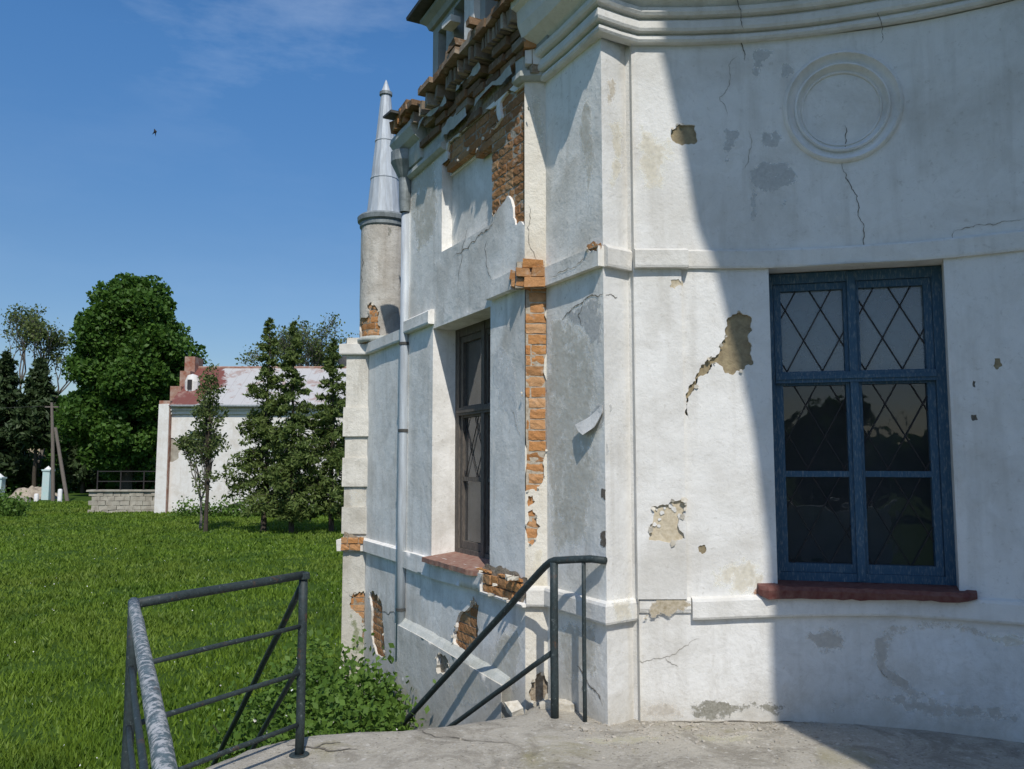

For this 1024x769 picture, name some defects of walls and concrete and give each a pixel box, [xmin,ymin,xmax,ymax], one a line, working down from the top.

crack [719,0,746,116]
spalling [389,0,530,223]
peeling [640,123,697,187]
crack [843,126,865,245]
crack [456,227,492,285]
flaking render [509,258,547,290]
crack [564,294,617,326]
spalling [685,311,753,414]
spalling [648,497,688,547]
flaking render [349,590,385,657]
flaking render [451,564,527,650]
leakage [647,700,783,721]